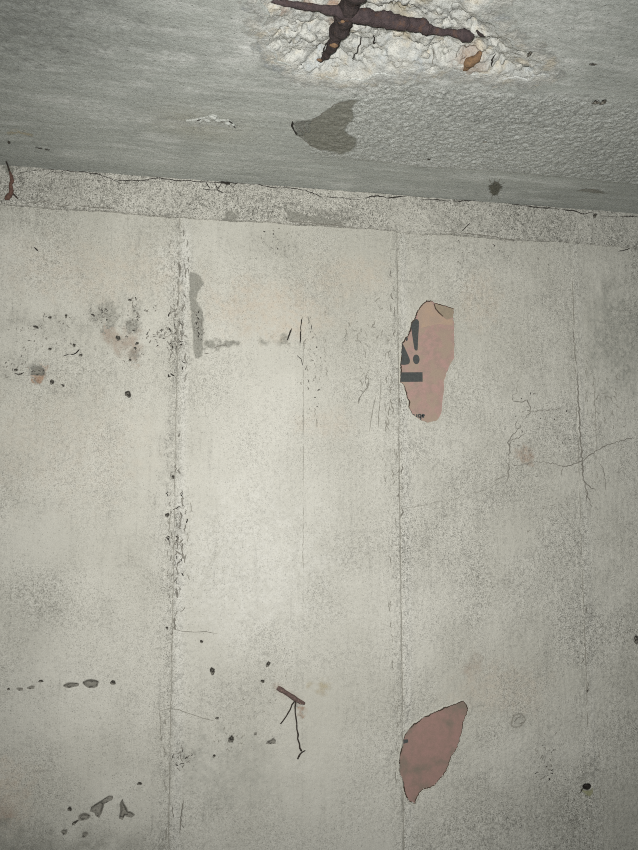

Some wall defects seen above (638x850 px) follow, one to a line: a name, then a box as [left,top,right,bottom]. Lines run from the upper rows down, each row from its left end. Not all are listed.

rust [271,0,475,63]
spalling [238,0,566,93]
leakage [291,100,357,154]
leakage [189,273,239,358]
peeling [399,299,456,425]
crack [408,330,638,508]
peeling [397,699,469,806]